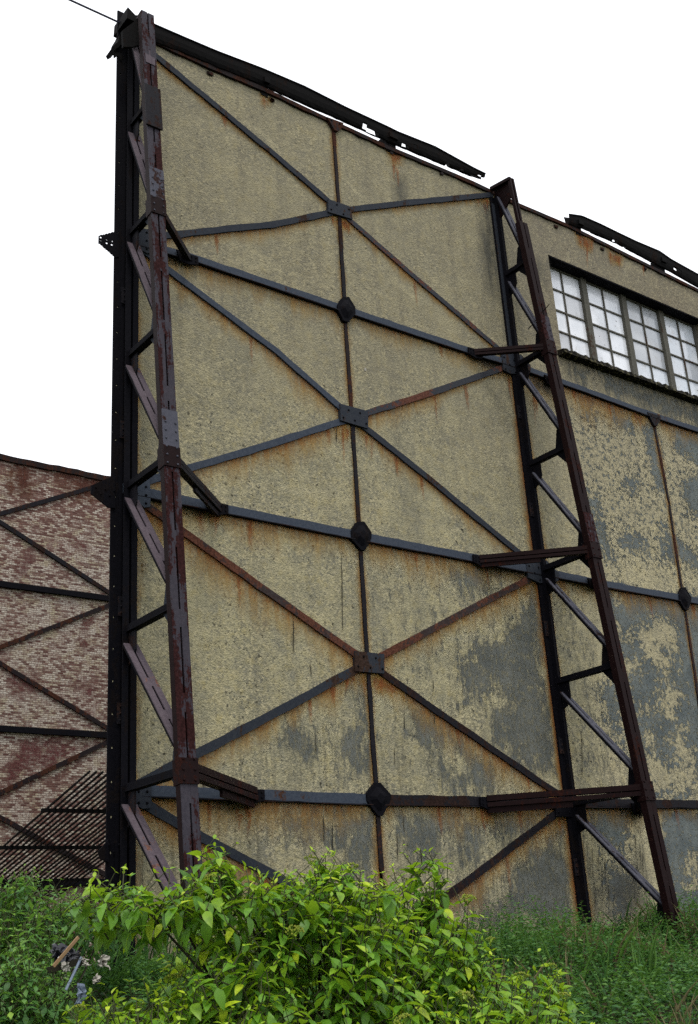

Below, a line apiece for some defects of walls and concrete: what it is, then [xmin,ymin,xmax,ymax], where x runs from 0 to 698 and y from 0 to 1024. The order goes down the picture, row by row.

corrosion [168,257,338,412]
peeling [568,363,698,914]